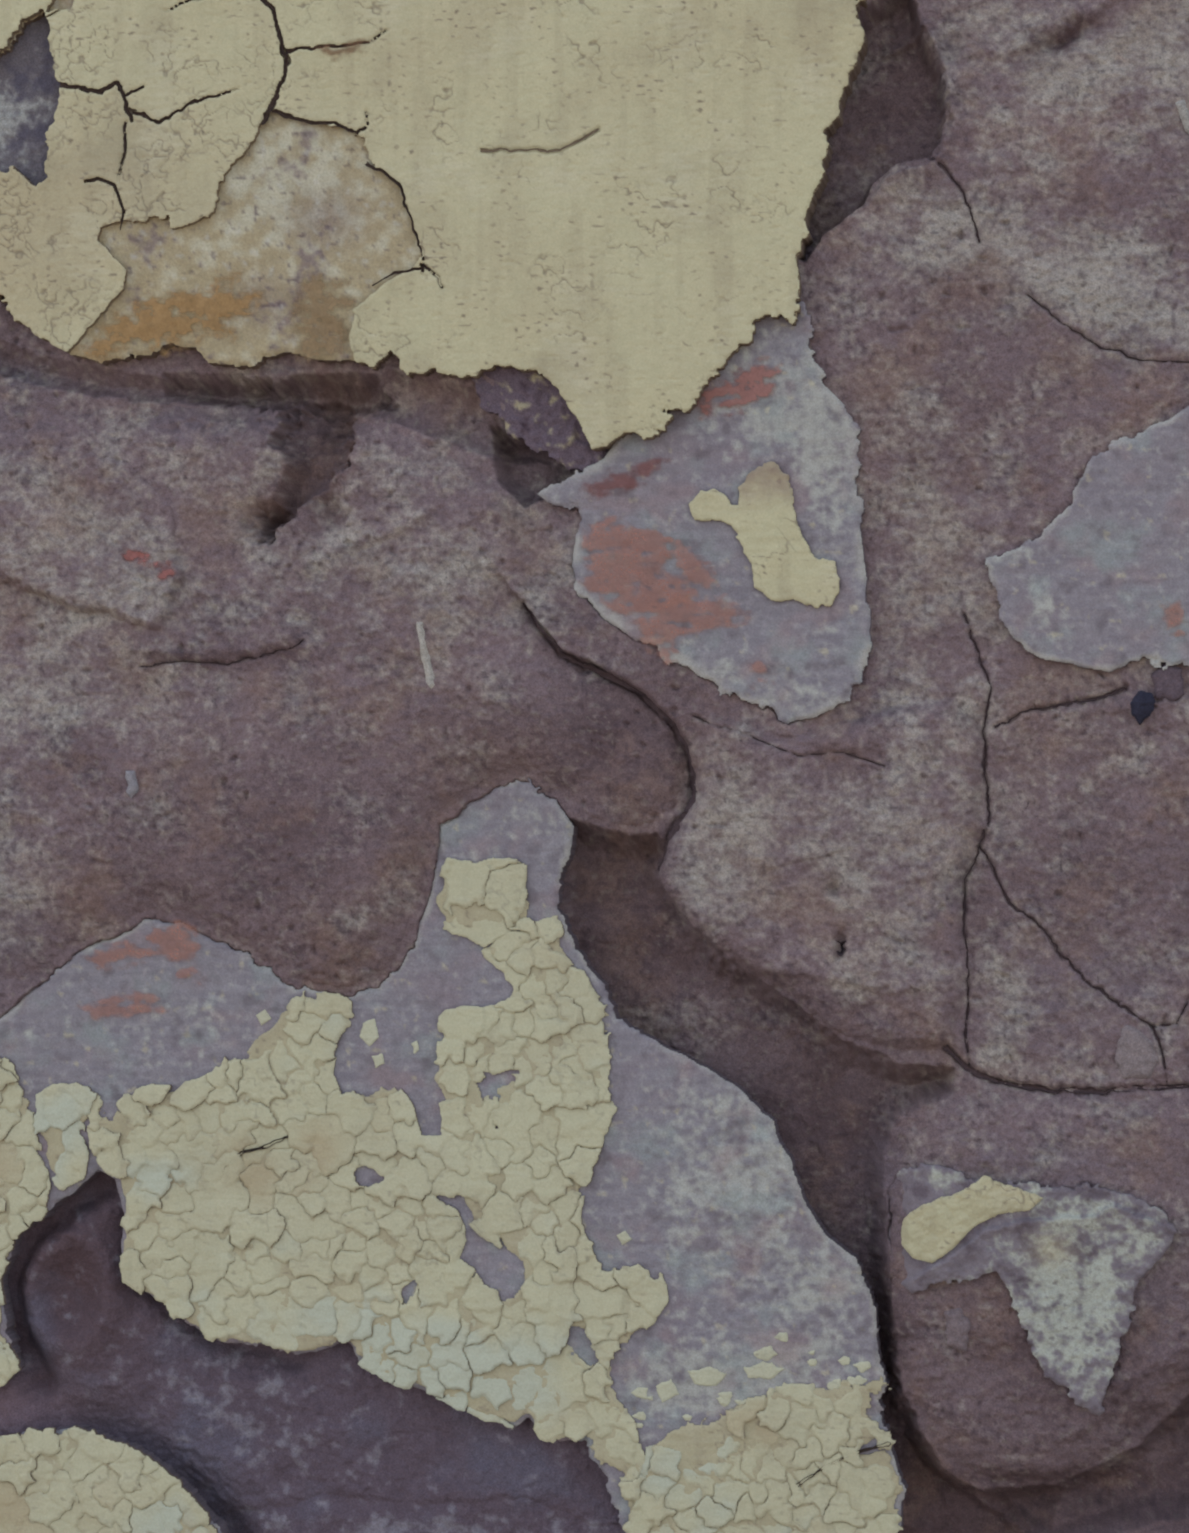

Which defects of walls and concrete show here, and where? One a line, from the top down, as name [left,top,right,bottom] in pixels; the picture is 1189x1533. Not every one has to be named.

crack [59,81,234,230]
crack [261,0,443,288]
crack [480,128,599,153]
peeling [0,0,873,724]
peeling [985,406,1189,701]
crack [522,603,884,871]
crack [943,614,1189,1095]
peeling [0,777,908,1533]
peeling [889,1163,1177,1416]